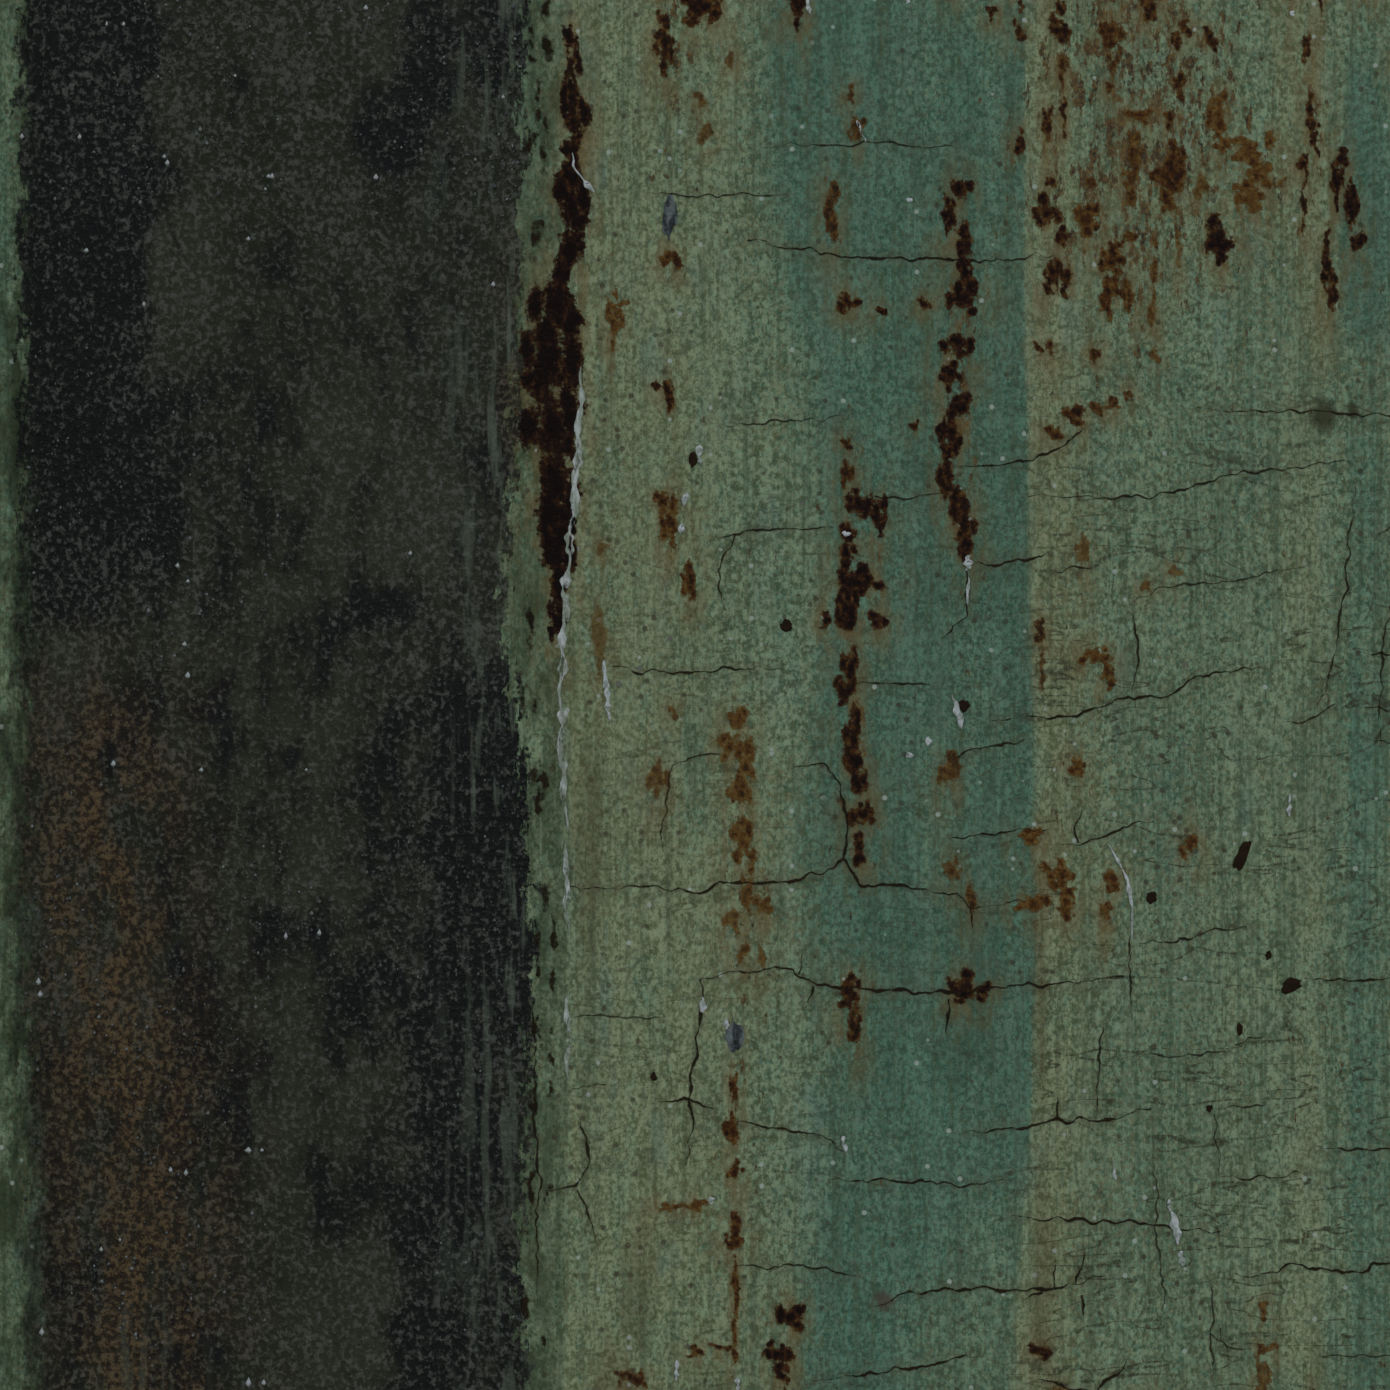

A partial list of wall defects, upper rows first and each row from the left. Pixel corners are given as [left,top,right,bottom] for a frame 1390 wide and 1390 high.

rust [651,0,723,78]
rust [1031,0,1219,327]
rust [1204,88,1368,312]
rust [511,24,593,644]
crack [956,567,1301,758]
crack [1028,460,1390,744]
rust [716,705,775,969]
crack [570,753,1024,927]
crack [658,926,1262,1164]
rust [761,1304,806,1390]
crack [875,1158,1220,1328]
crack [1209,1261,1390,1377]